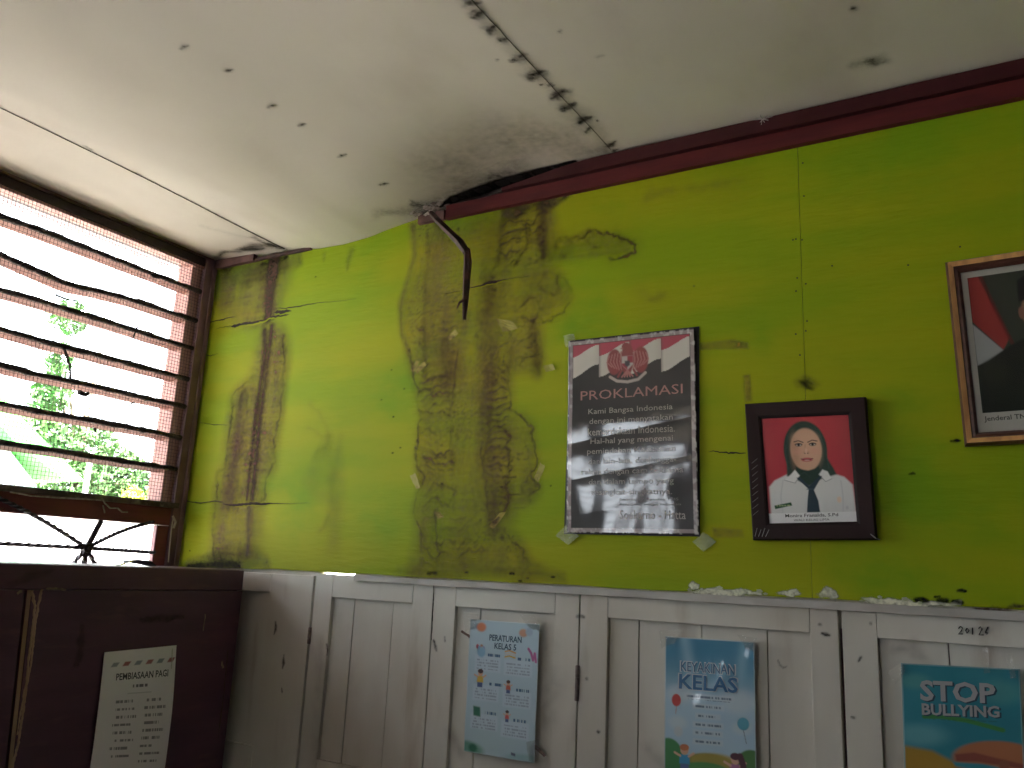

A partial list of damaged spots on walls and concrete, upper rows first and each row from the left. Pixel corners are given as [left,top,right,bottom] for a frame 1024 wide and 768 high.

crack [207,299,350,356]
damp [186,240,301,570]
crack [187,500,311,508]
peeling [687,582,800,597]
peeling [819,587,838,598]
peeling [859,595,961,607]